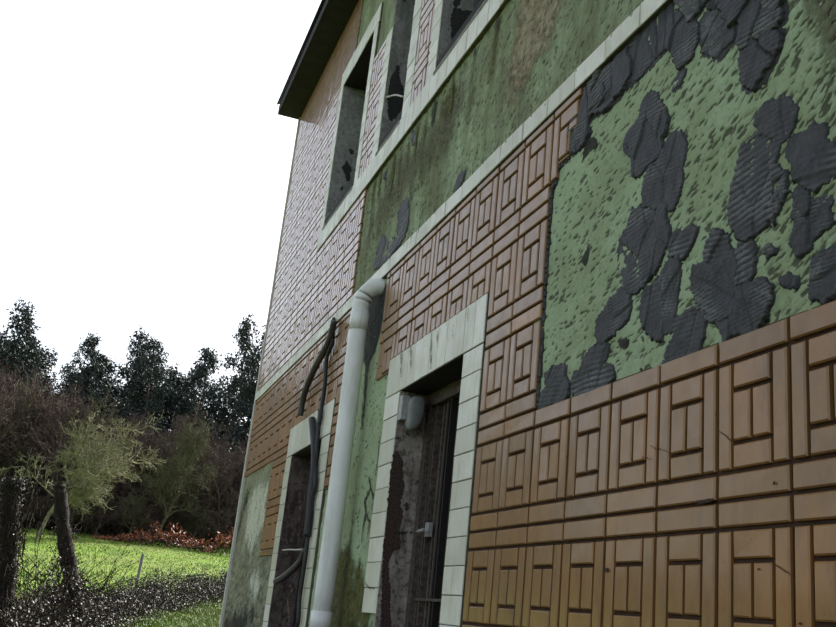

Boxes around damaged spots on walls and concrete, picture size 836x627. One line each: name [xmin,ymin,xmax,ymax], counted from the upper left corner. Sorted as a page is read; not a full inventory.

damp [368,73,476,241]
spalling [354,0,644,294]
spalling [534,0,836,410]
damp [224,607,254,627]
damp [331,518,369,627]
spalling [340,319,388,602]
crack [361,436,380,543]